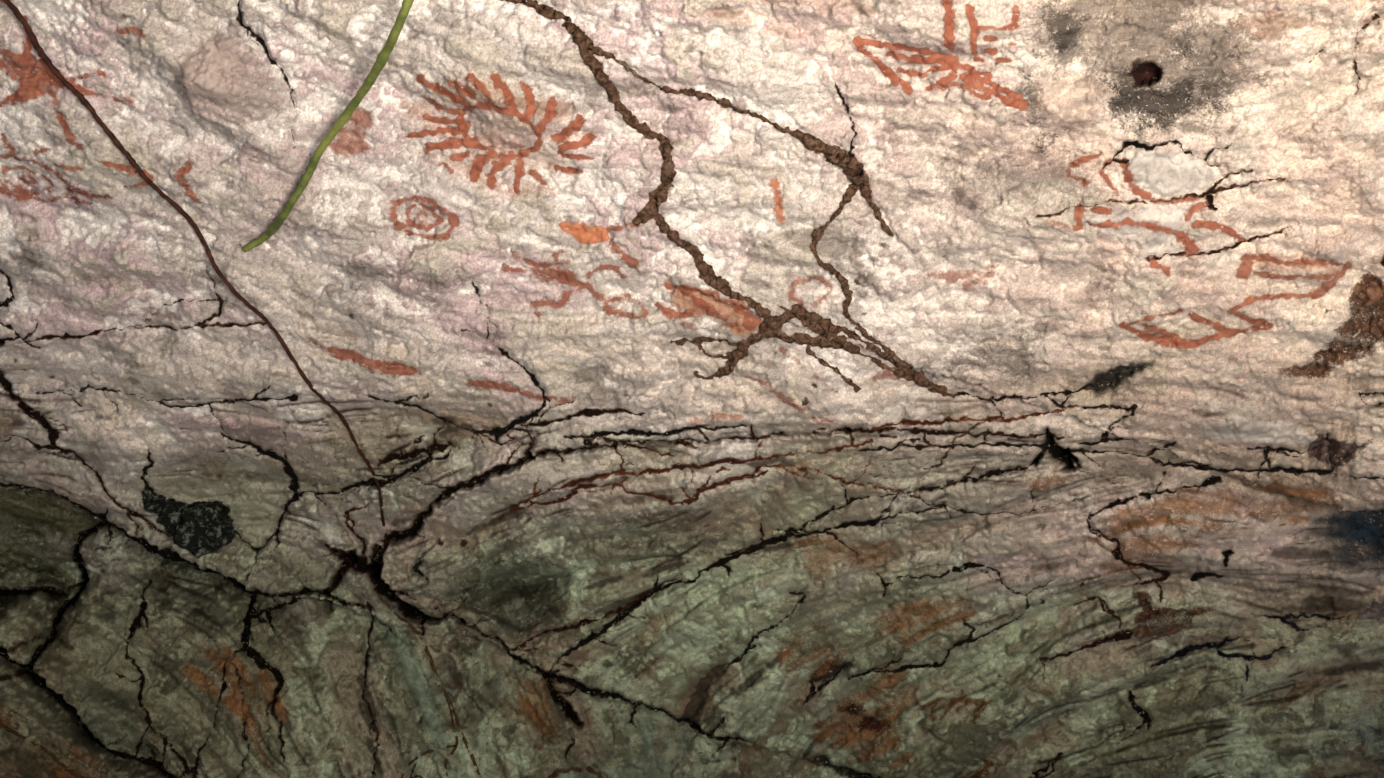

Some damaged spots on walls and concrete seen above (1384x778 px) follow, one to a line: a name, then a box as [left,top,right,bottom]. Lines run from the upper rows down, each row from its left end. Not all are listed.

leakage [1043,11,1082,53]
crack [236,1,295,148]
crack [835,82,857,158]
leakage [1196,83,1230,109]
crack [1036,140,1286,218]
crack [1146,227,1288,261]
crack [0,266,1384,778]